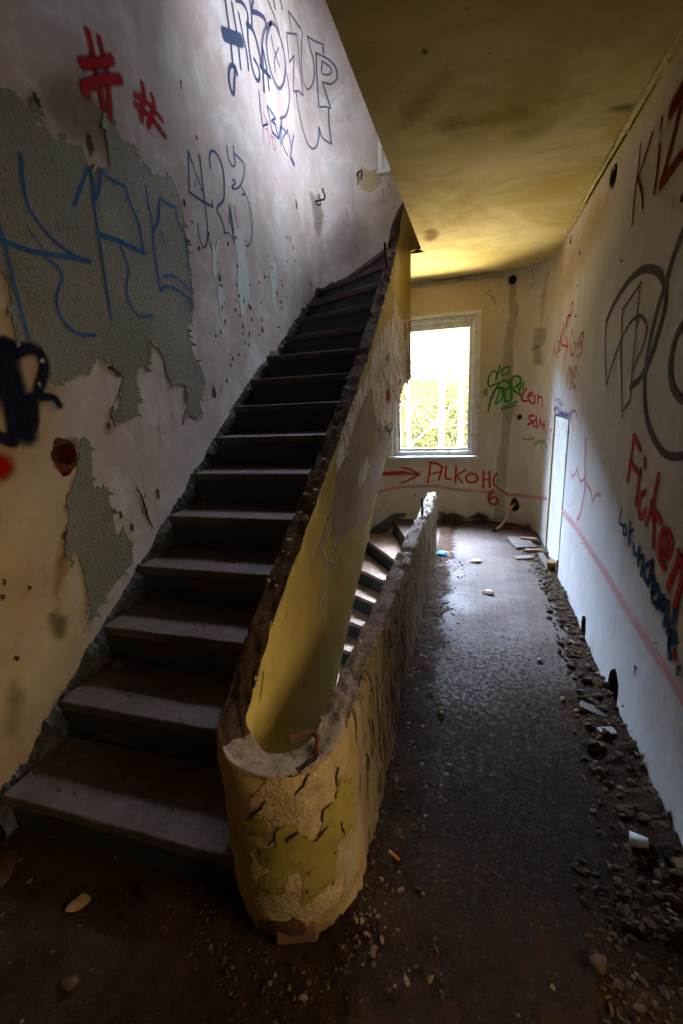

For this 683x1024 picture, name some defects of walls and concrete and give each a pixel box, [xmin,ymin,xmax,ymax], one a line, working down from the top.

peeling [0,87,295,430]
flaking render [358,166,382,192]
flaking render [314,292,411,563]
peeling [61,436,135,621]
peeling [241,754,354,945]